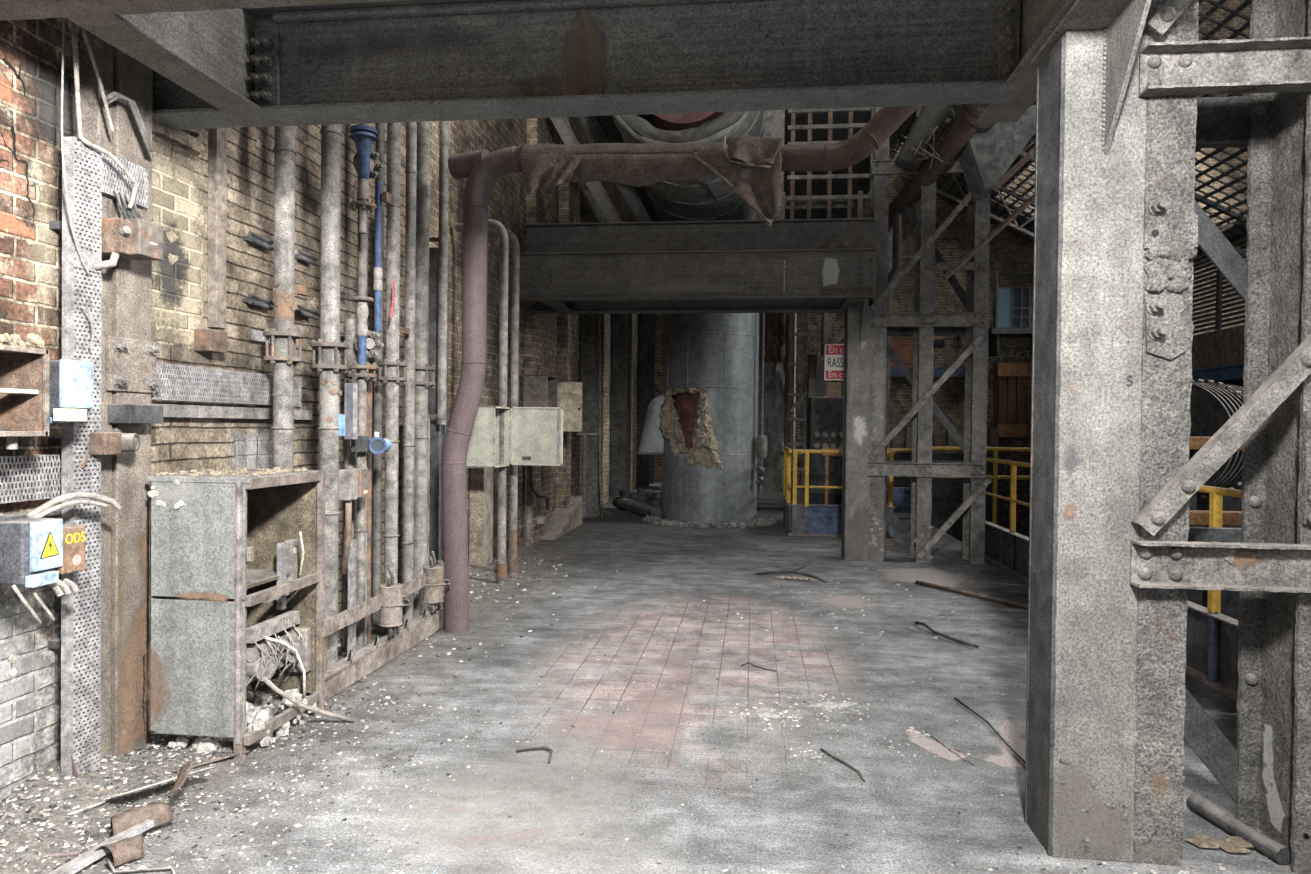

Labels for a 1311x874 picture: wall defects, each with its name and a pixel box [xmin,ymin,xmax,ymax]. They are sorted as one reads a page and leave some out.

crack [2,58,26,97]
crack [0,125,41,228]